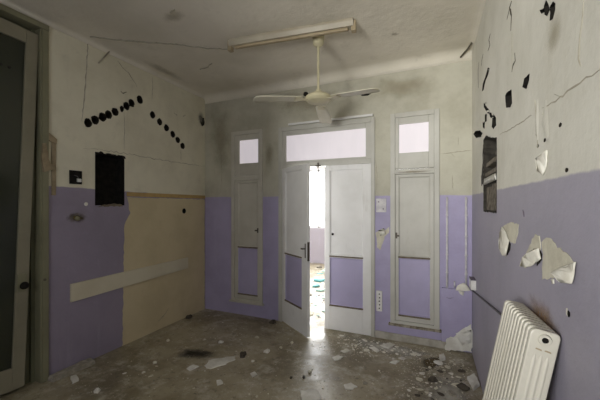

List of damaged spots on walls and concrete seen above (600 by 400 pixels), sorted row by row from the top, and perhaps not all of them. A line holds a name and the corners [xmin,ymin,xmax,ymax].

spalling [540,1,555,20]
crack [82,36,227,118]
crack [502,0,600,148]
spalling [474,103,496,138]
peeling [535,138,548,175]
peeling [499,222,519,257]
peeling [519,234,576,284]
spalling [445,324,472,352]